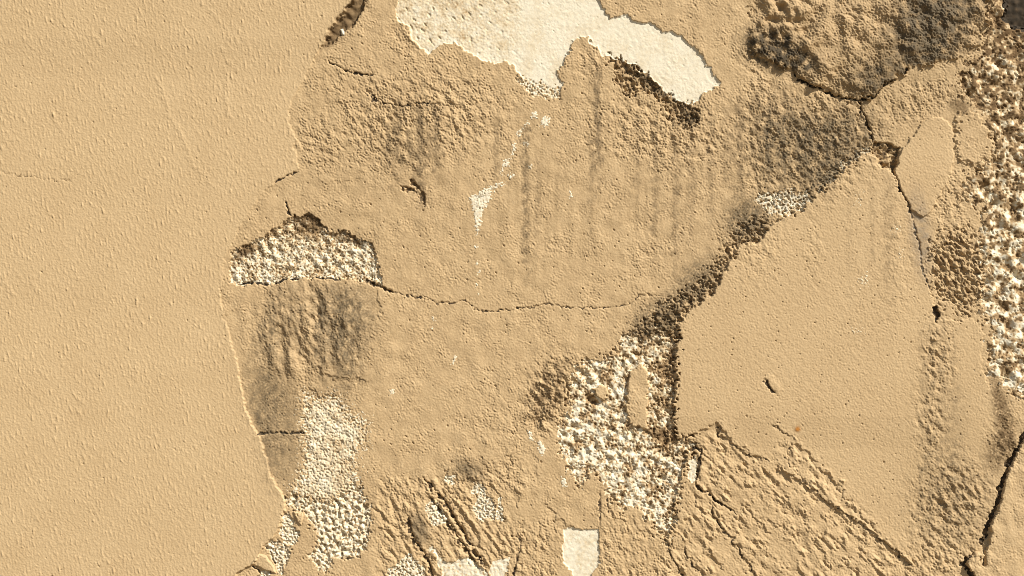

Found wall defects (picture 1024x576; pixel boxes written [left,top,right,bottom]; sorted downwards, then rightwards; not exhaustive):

spalling [323,0,366,48]
spalling [395,0,721,129]
spalling [229,212,382,287]
water stain [315,289,362,358]
crack [240,277,659,312]
spalling [527,142,900,546]
crack [893,174,930,289]
spalling [925,0,1024,401]
spalling [251,383,378,576]
spalling [562,527,601,576]
crack [691,426,912,574]
crack [959,433,1024,576]